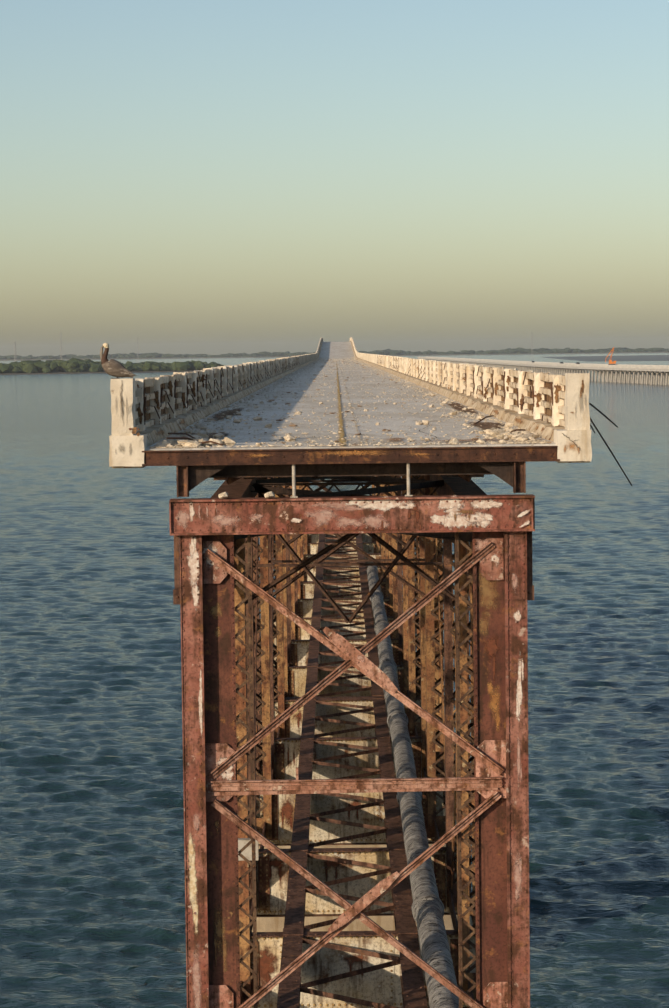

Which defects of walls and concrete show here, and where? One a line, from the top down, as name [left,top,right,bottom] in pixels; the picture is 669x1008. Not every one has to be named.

peeling [431,496,502,530]
peeling [175,502,239,607]
rust [479,574,500,727]
rust [269,858,286,880]
rust [324,861,345,882]
rust [214,911,227,971]
rust [258,947,278,985]
rust [344,955,368,977]